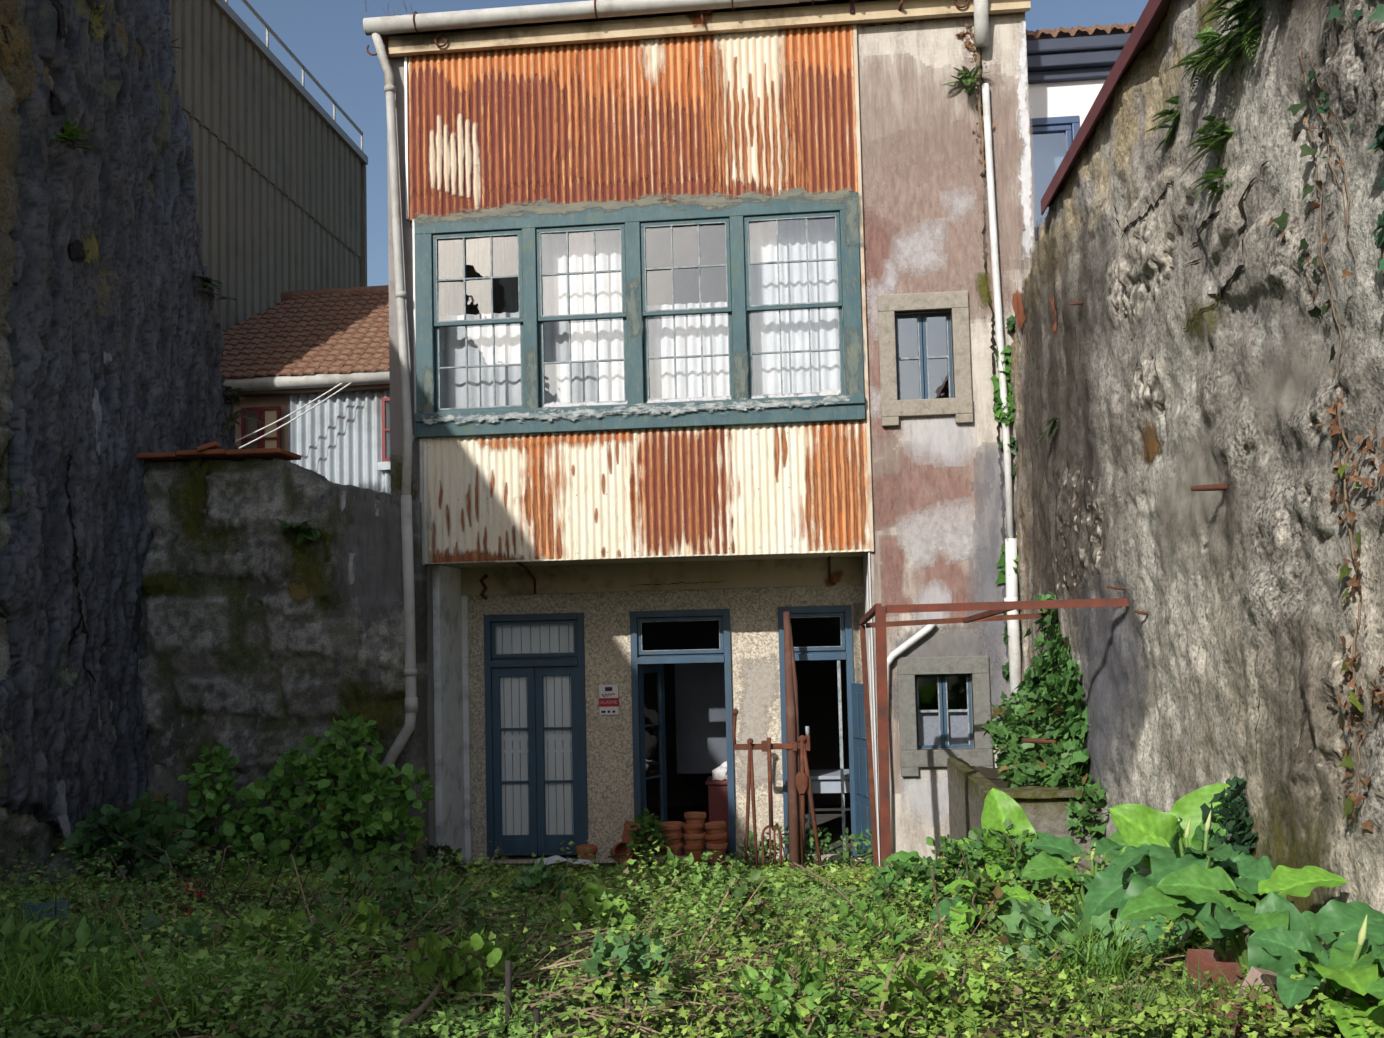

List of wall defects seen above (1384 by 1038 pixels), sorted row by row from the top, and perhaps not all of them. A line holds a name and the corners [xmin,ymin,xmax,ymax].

rust [408,9,858,221]
water stain [867,193,970,331]
crack [1100,160,1270,329]
crack [65,451,96,696]
water stain [314,482,434,641]
rust [430,426,740,563]
rust [774,425,787,482]
rust [801,420,870,551]
water stain [869,391,881,414]